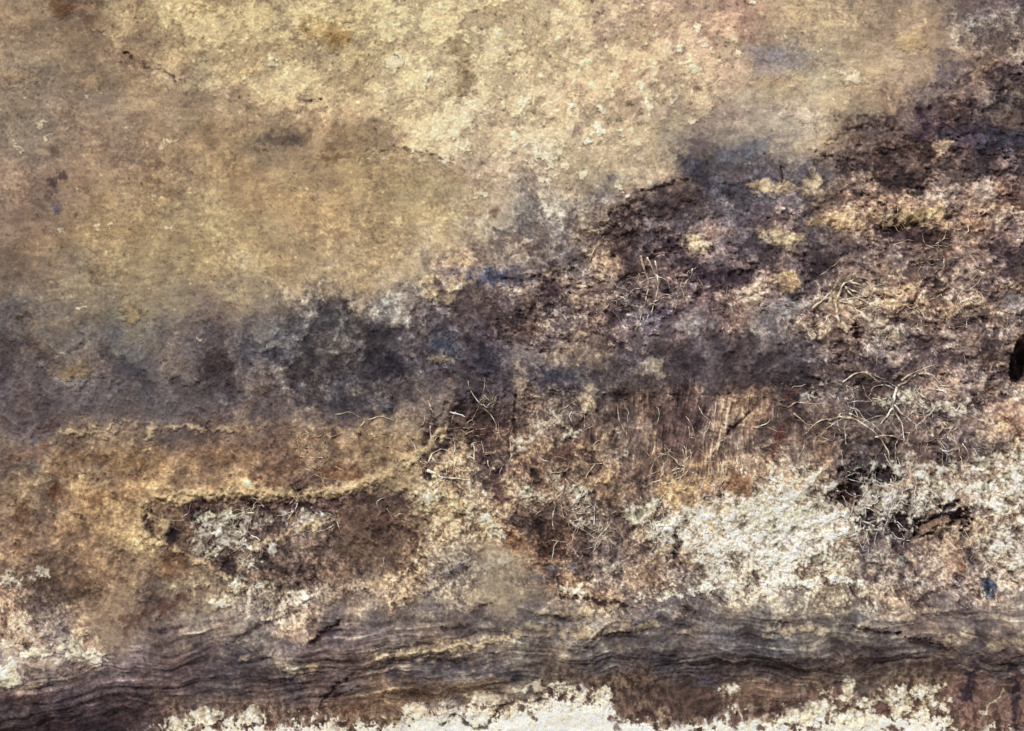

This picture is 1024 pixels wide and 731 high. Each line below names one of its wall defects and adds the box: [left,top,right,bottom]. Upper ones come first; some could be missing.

water stain [41,145,91,214]
water stain [252,117,409,168]
water stain [487,205,501,218]
water stain [645,123,841,220]
water stain [0,259,1024,623]